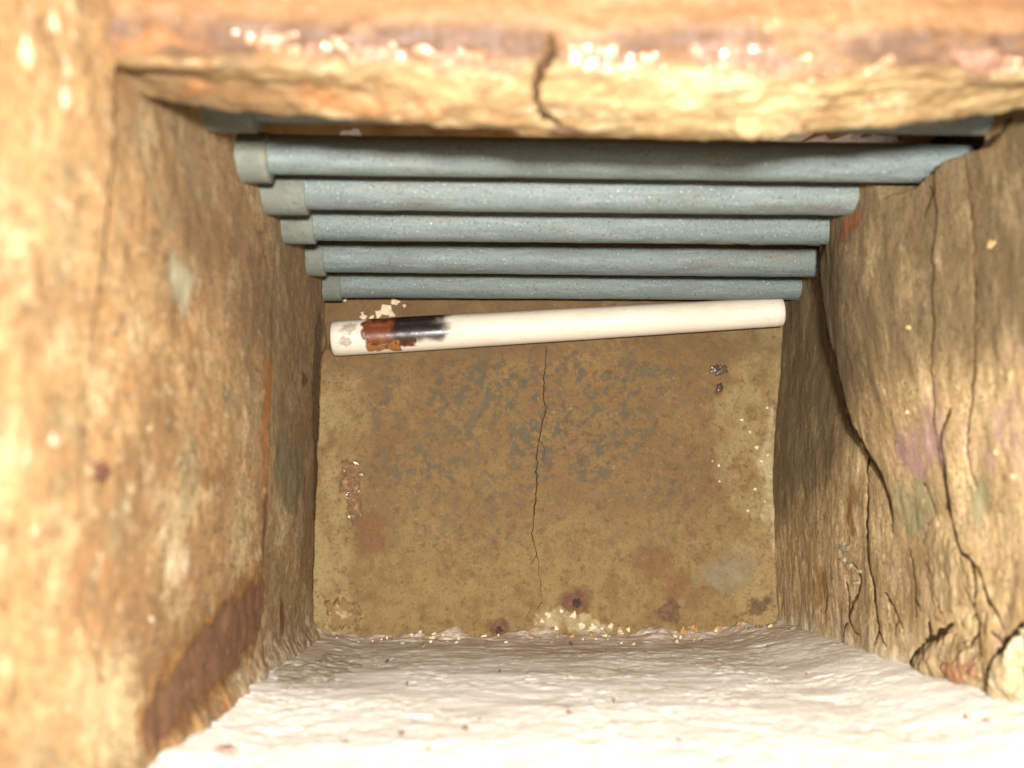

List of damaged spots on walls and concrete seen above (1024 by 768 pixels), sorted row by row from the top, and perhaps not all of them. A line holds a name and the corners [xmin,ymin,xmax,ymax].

crack [531,31,563,128]
crack [531,346,547,609]
crack [818,116,1024,686]
corrosion [139,566,268,754]
corrosion [491,618,508,634]
corrosion [563,590,588,613]